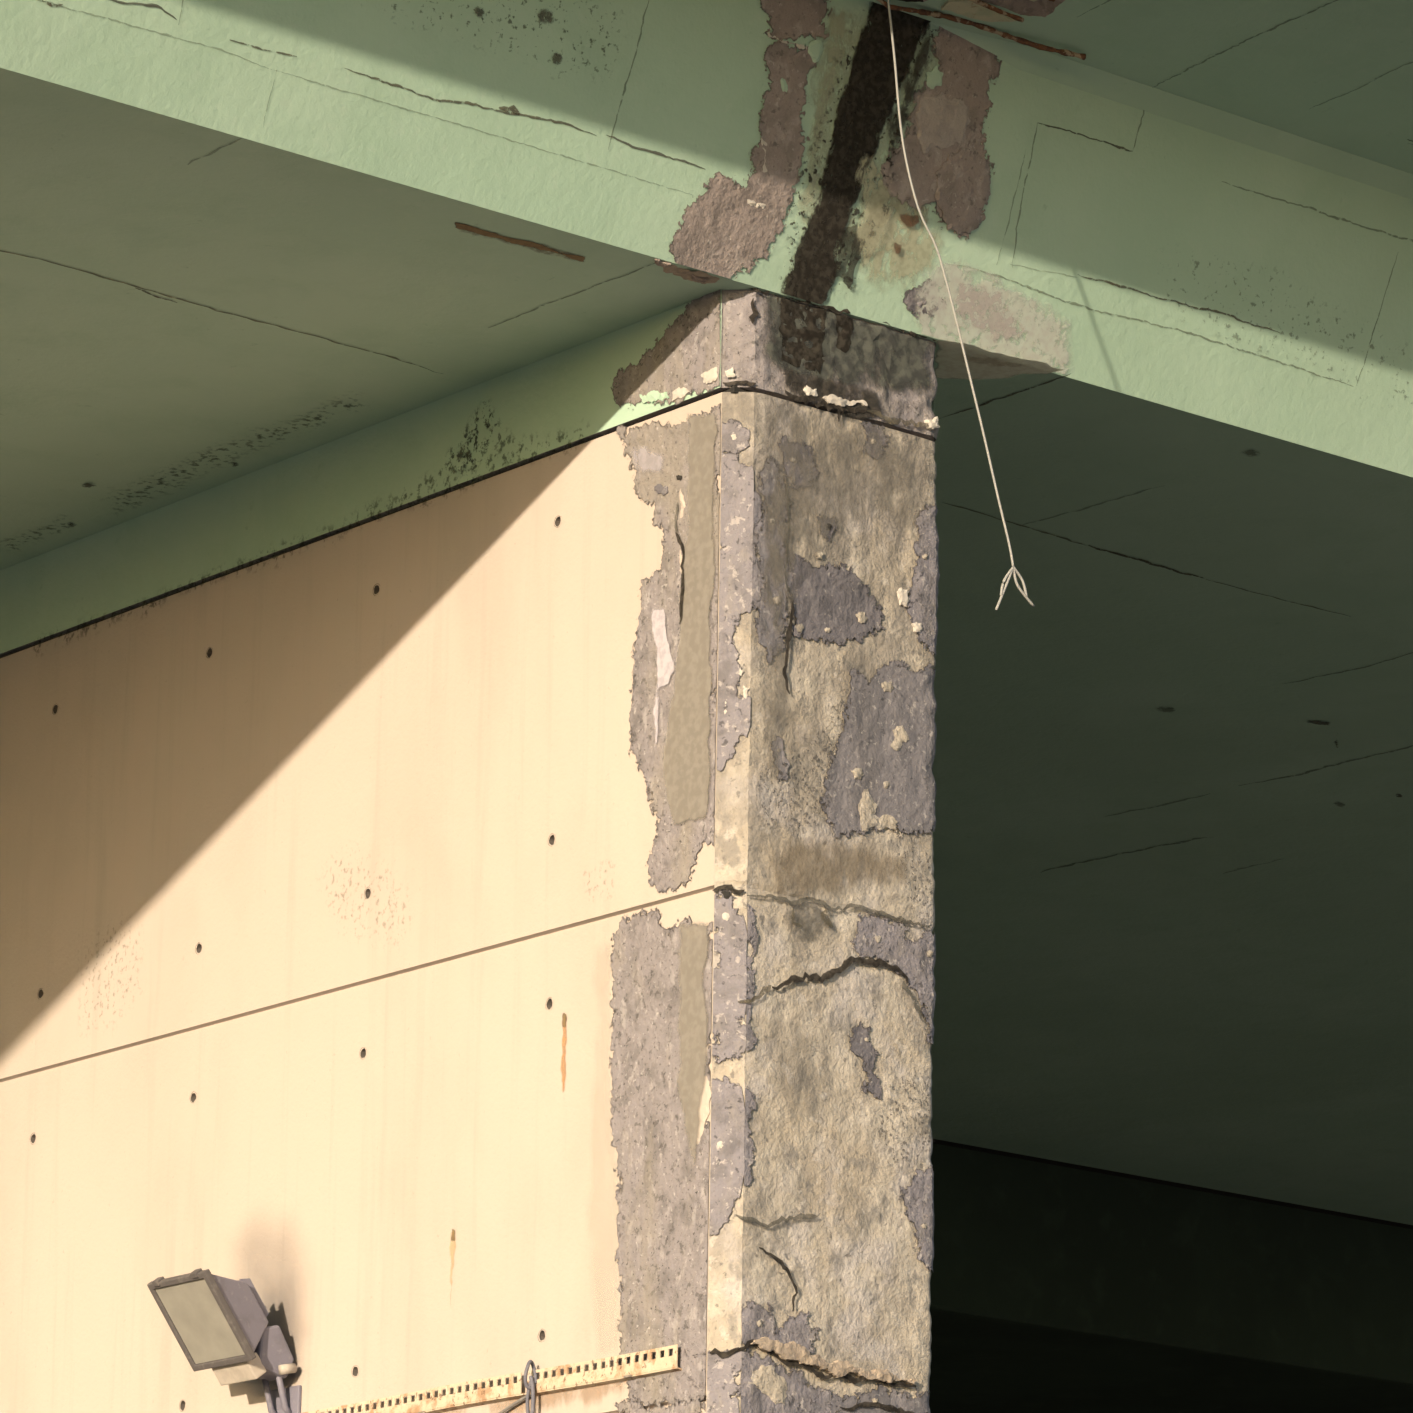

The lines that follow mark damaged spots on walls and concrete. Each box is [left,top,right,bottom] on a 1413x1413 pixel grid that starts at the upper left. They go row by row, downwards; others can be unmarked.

crack [112,0,177,20]
peeling [877,0,1086,241]
crack [0,250,442,374]
corrosion [455,222,585,262]
damp [765,2,1069,418]
peeling [935,340,1062,379]
crack [1078,274,1280,333]
damp [349,413,581,527]
damp [924,416,940,430]
peeling [608,0,946,1413]
crack [713,884,930,1022]
crack [710,1213,927,1413]